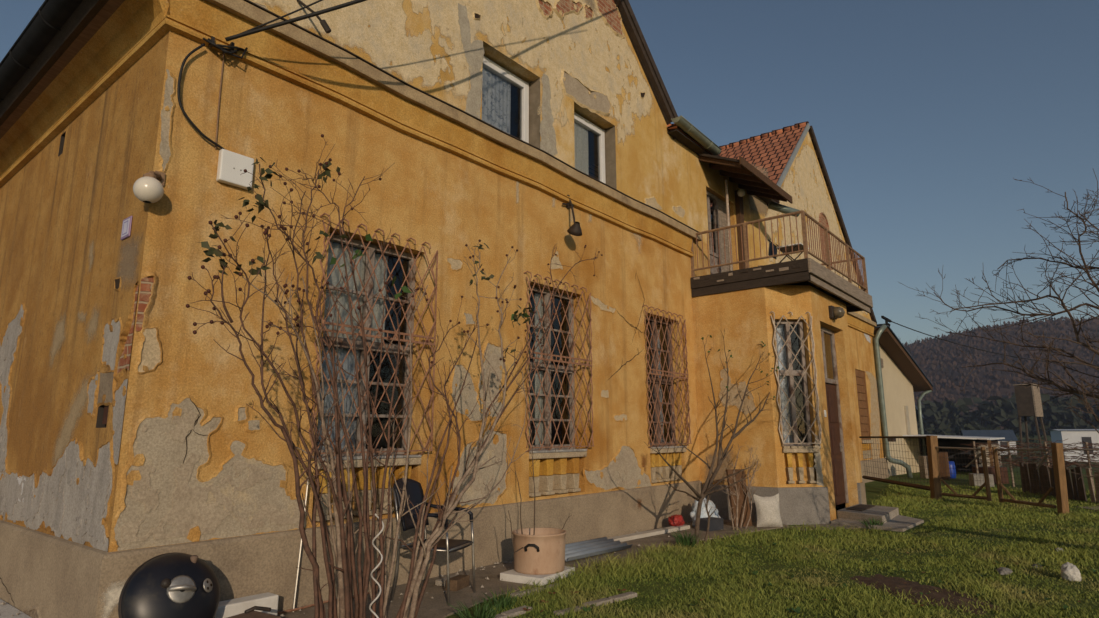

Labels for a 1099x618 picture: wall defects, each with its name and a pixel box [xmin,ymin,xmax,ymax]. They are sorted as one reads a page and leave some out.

peeling [250,0,652,155]
flaking render [0,271,309,552]
flaking render [449,341,509,507]
flaking render [583,444,652,491]